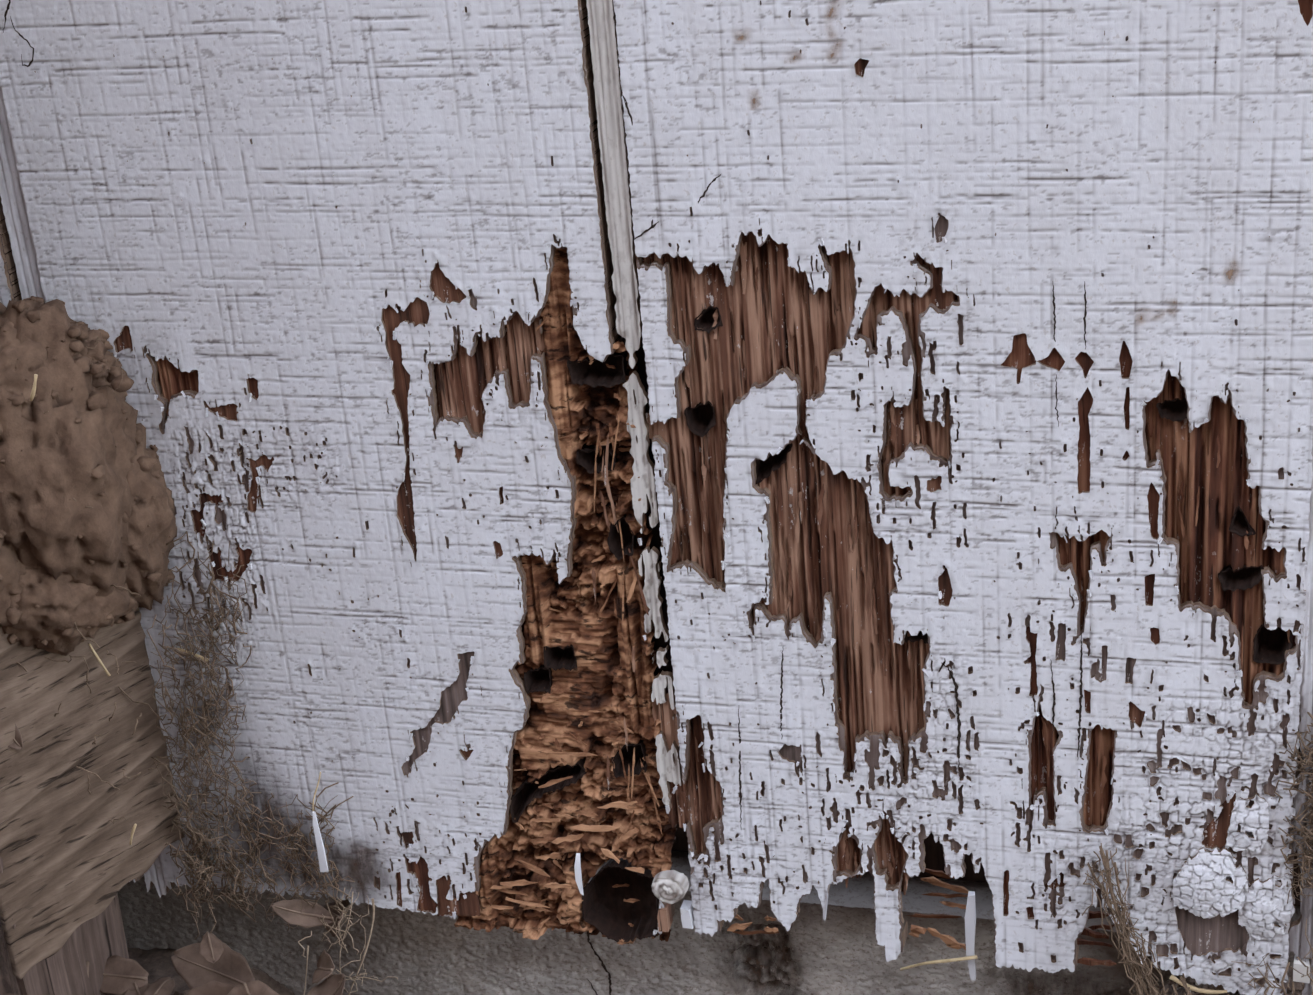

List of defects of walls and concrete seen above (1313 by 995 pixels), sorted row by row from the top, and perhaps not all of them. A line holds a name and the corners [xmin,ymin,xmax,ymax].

peeling [154,356,259,421]
peeling [192,490,252,583]
peeling [248,455,274,511]
peeling [383,262,466,557]
spalling [396,232,959,945]
peeling [1001,333,1094,492]
peeling [1054,530,1109,660]
peeling [1119,341,1285,704]
peeling [1026,626,1059,820]
peeling [1045,872,1065,889]